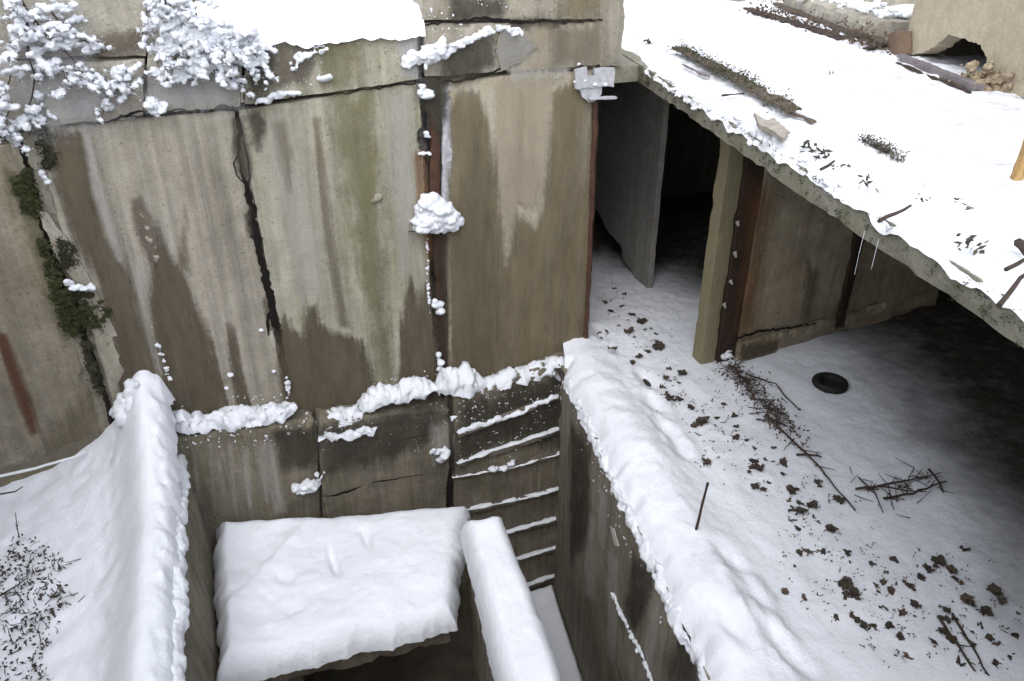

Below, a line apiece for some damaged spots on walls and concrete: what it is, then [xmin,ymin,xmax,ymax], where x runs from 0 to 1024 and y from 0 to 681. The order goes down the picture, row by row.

corrosion [0,334,36,434]
leakage [49,130,251,415]
crack [8,64,600,424]
crack [326,466,452,508]
leakage [448,77,594,377]
corrosion [583,102,598,339]